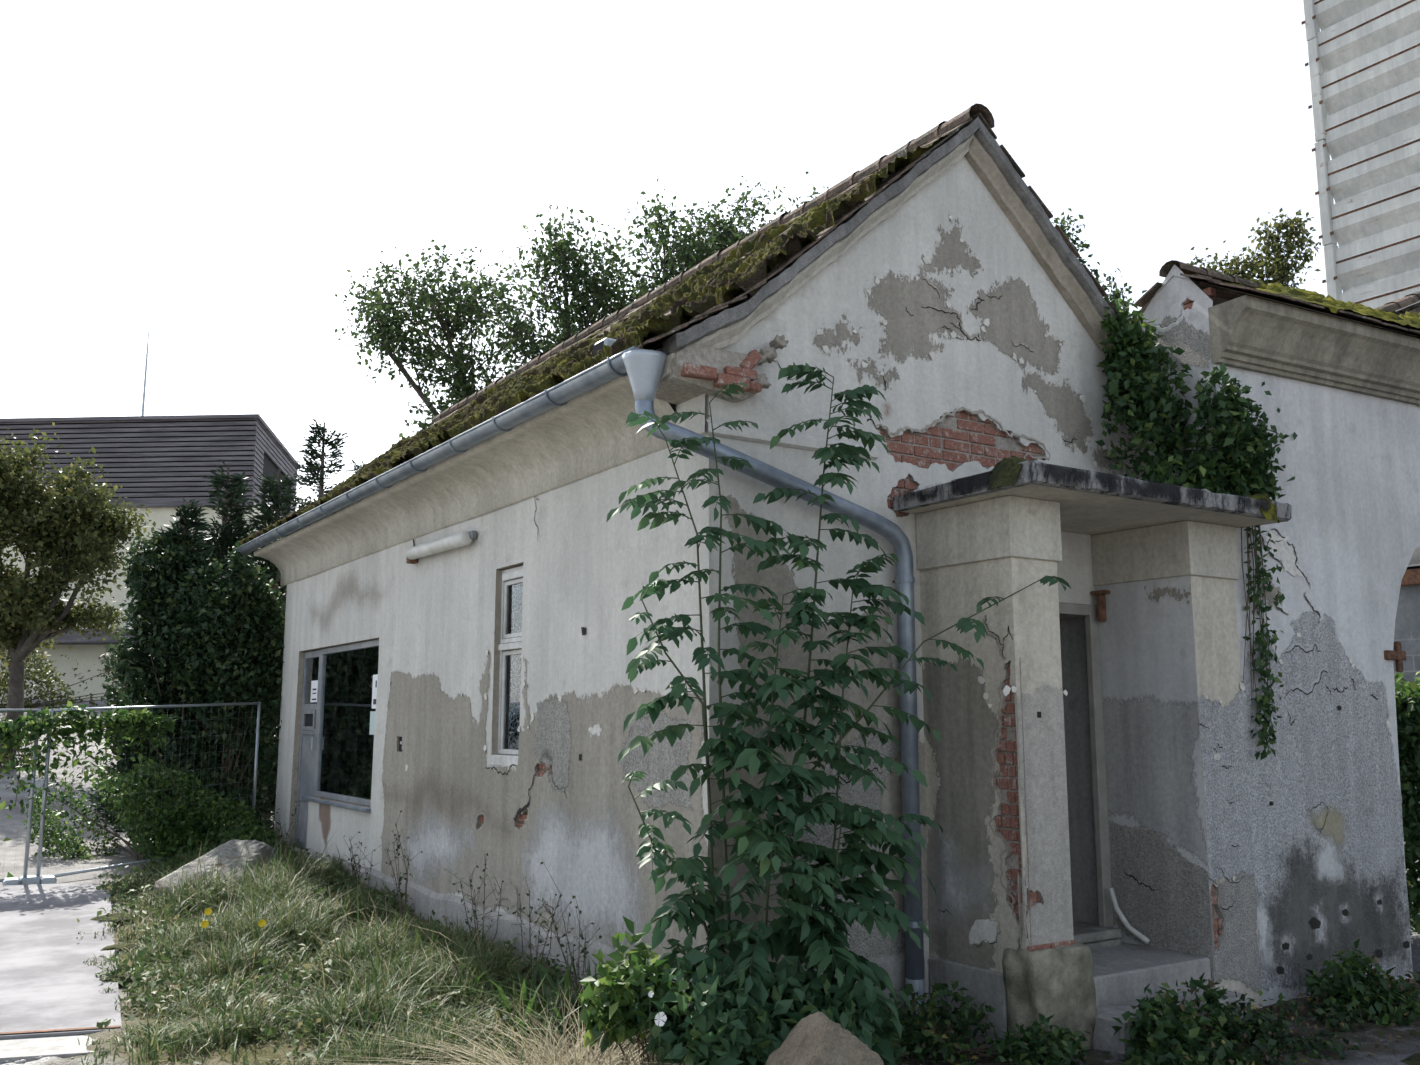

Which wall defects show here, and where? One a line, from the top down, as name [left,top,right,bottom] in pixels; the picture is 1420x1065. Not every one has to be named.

spalling [680,335,789,394]
flaking render [813,215,1123,517]
peeling [380,488,905,976]
peeling [918,654,1075,970]
flaking render [1108,523,1412,992]
leakage [1257,809,1406,987]